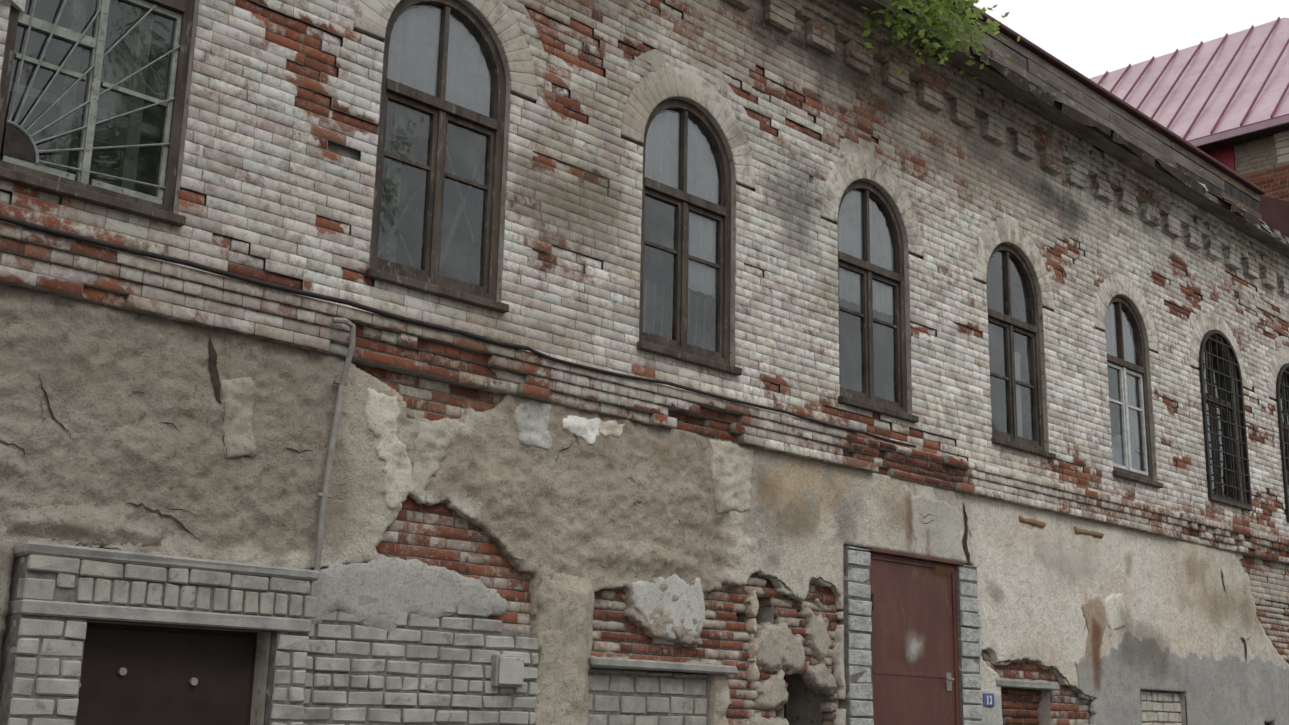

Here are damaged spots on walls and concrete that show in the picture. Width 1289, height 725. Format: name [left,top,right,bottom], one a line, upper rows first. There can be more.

crack [0,375,71,455]
crack [209,334,313,460]
crack [124,500,222,546]
spalling [324,323,531,633]
crack [963,502,972,565]
peeling [1179,488,1289,583]
spalling [590,572,839,725]
spalling [981,593,1126,725]
spalling [1255,600,1289,664]